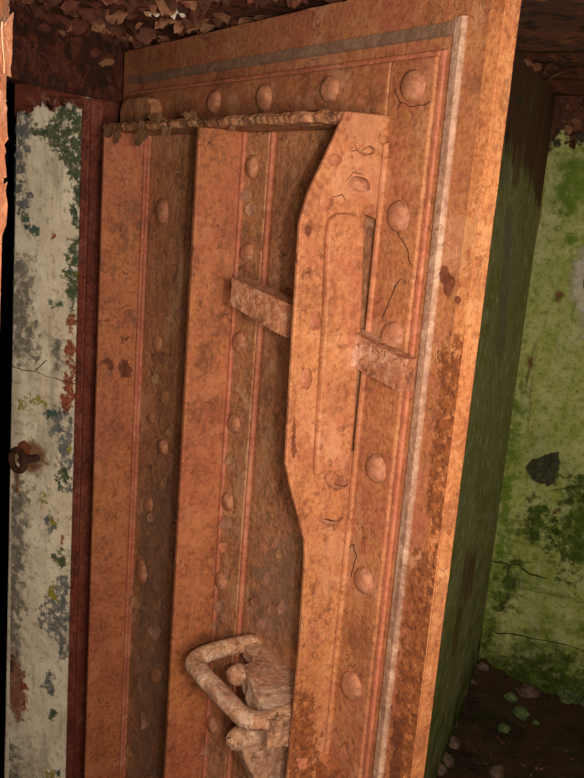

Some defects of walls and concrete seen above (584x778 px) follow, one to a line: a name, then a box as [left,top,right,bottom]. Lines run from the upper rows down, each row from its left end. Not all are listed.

peeling [9,0,308,49]
peeling [0,102,8,248]
water stain [499,133,510,188]
rust [439,266,462,305]
rust [103,358,133,379]
rust [15,441,45,493]
water stain [526,452,561,486]
rust [384,333,464,778]
crack [487,627,583,651]
rust [289,678,323,778]